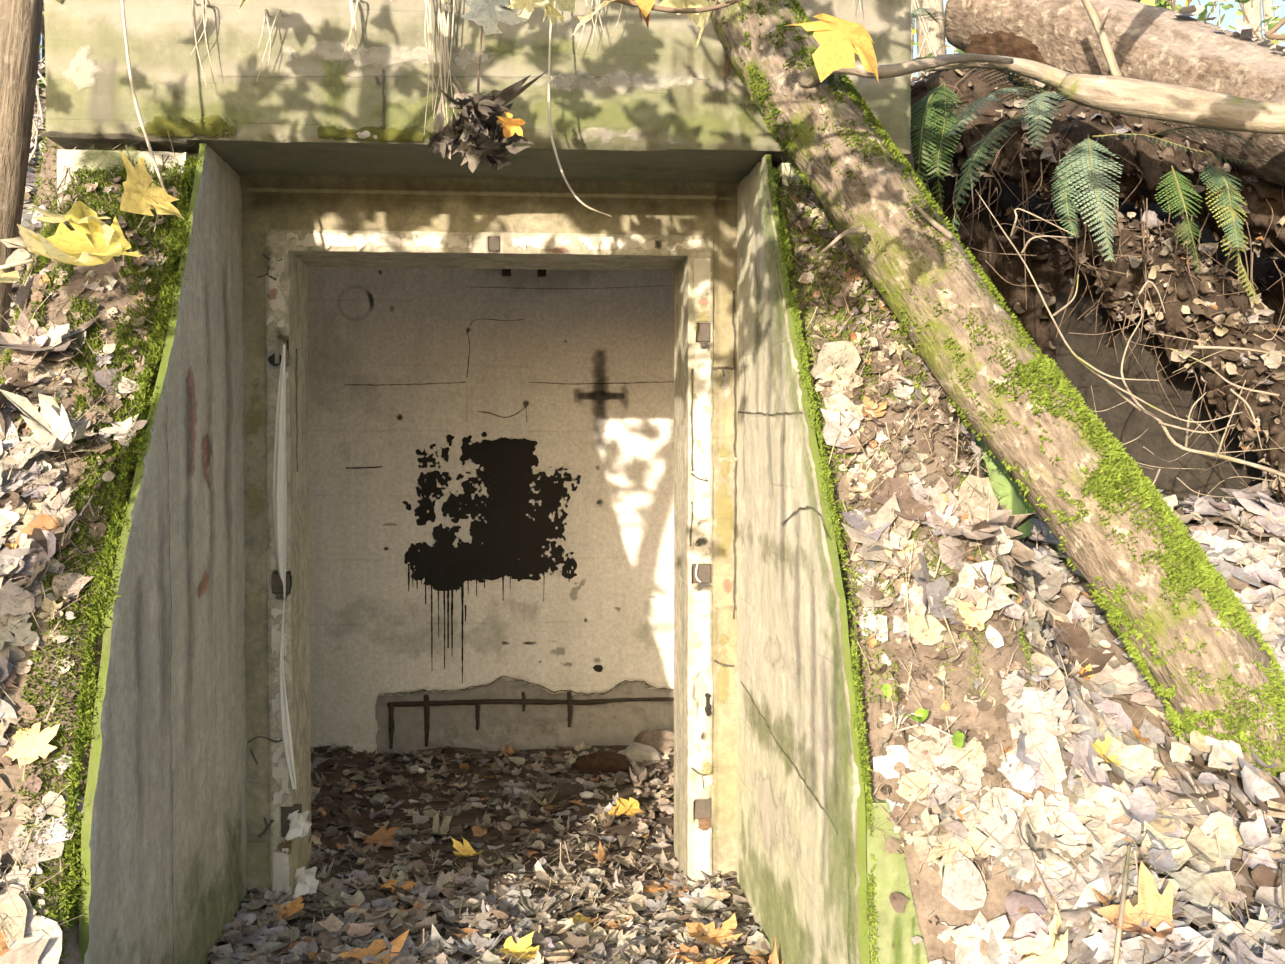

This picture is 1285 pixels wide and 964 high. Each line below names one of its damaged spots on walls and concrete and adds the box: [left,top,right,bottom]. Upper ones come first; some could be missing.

damp [314,43,434,129]
damp [540,70,692,92]
damp [579,128,650,140]
peeling [693,349,711,560]
spalling [375,676,674,754]
peeling [691,590,713,764]
peeling [693,824,712,870]